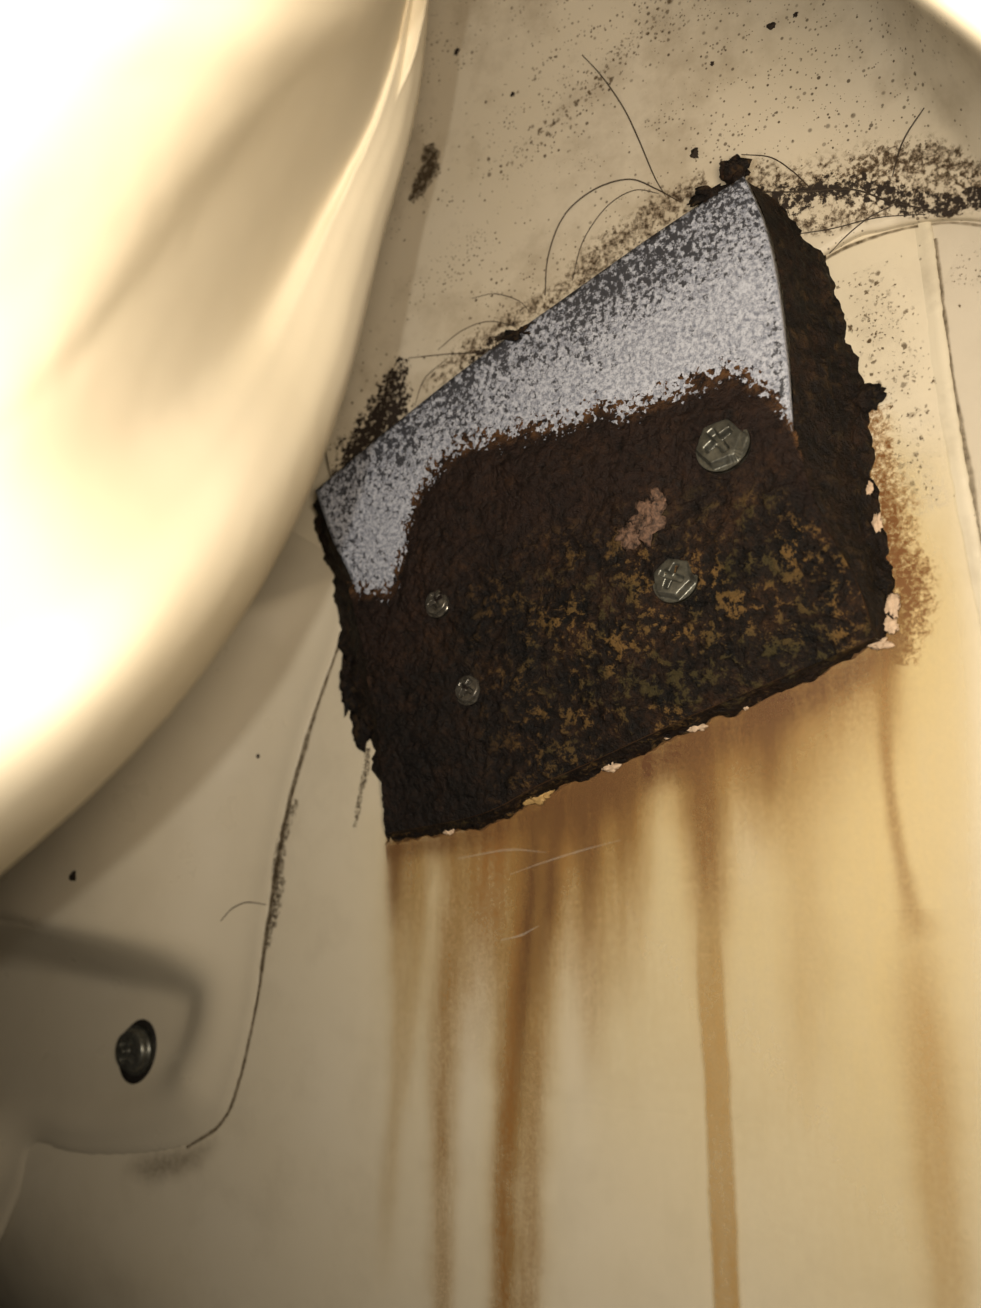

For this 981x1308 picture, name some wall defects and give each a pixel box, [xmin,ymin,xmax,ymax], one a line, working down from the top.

rust [687,154,752,207]
rust [502,324,531,342]
rust [339,356,961,1308]